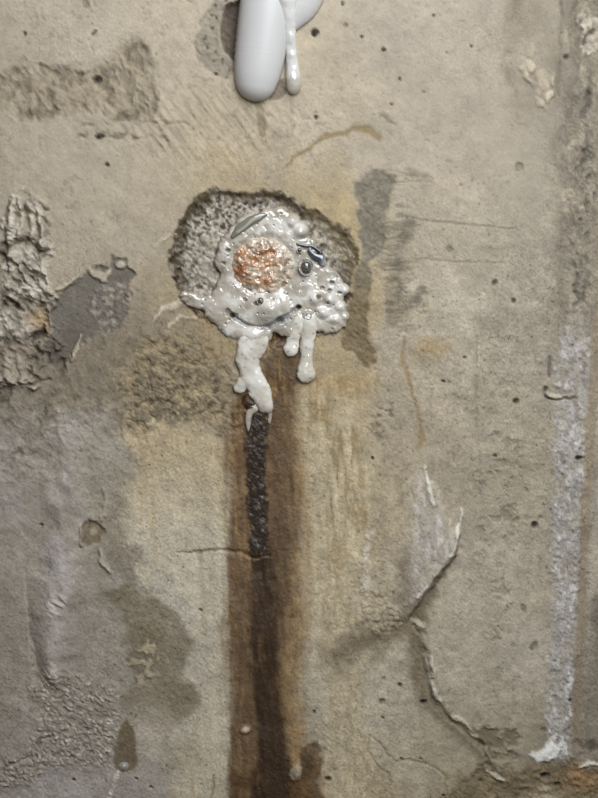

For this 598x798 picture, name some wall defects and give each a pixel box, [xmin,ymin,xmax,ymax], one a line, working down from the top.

spalling [0,186,137,392]
leakage [0,394,226,798]
rust [217,332,331,798]
leakage [129,0,598,798]
crack [408,616,526,782]